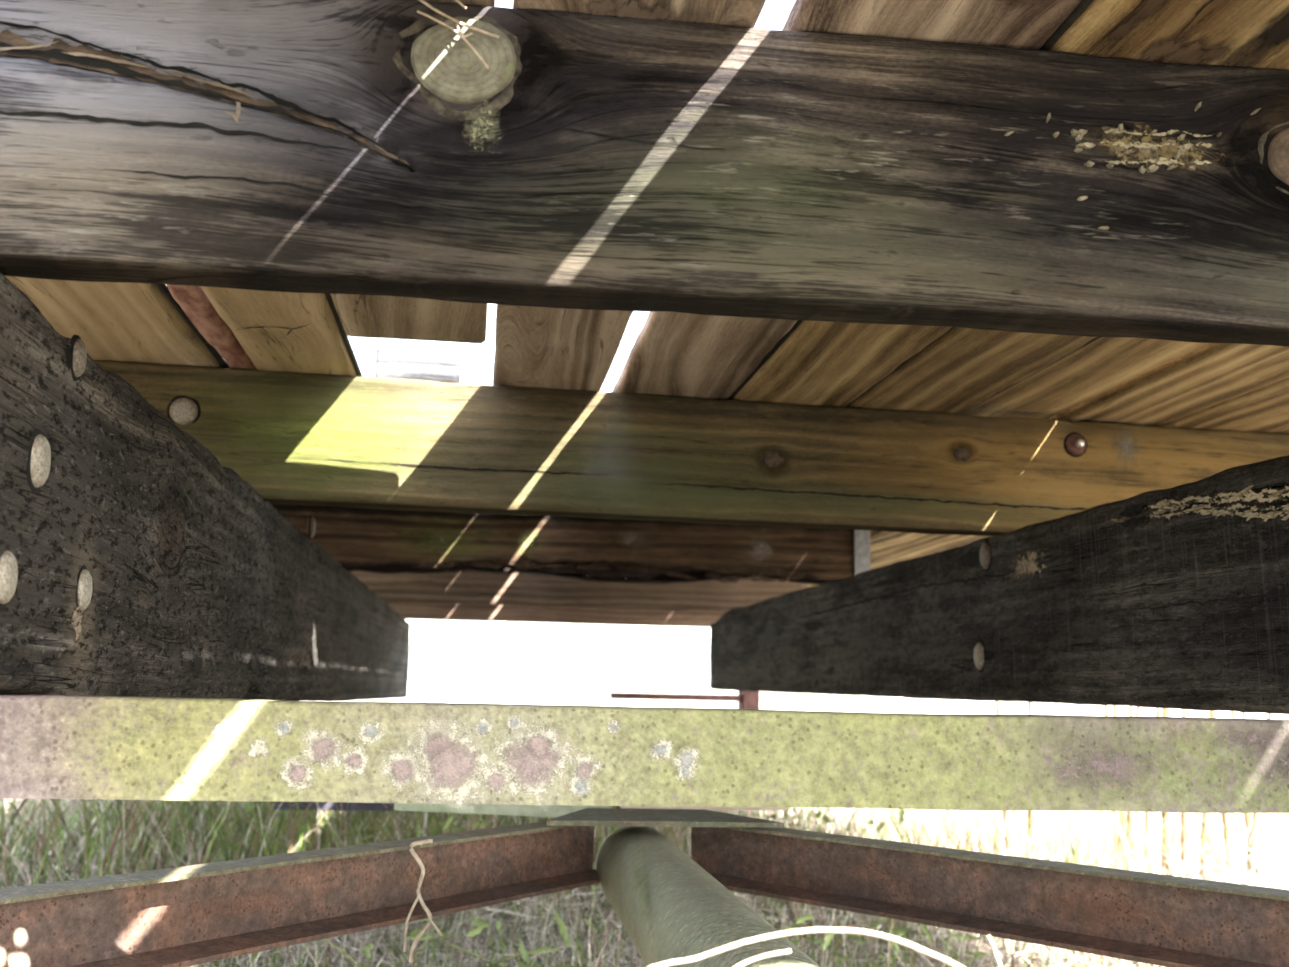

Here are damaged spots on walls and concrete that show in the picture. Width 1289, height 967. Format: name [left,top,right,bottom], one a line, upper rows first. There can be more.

peeling [1046,113,1225,174]
peeling [1146,499,1212,517]
peeling [1223,485,1289,521]